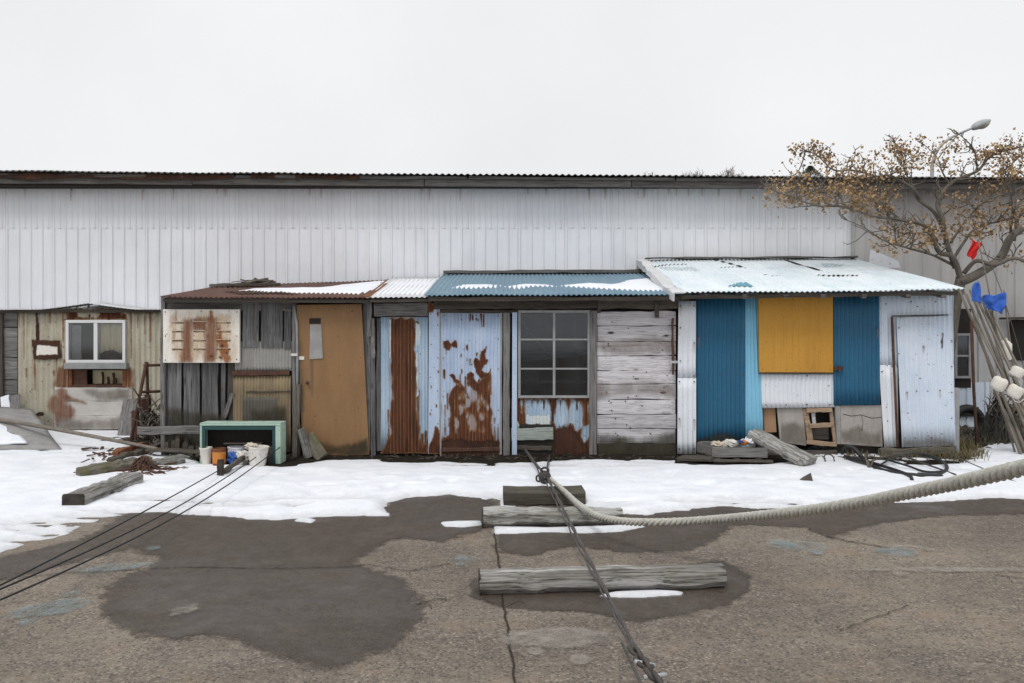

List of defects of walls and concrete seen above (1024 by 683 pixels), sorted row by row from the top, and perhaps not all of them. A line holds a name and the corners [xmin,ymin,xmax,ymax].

rust [23,308,151,418]
rust [173,311,230,363]
rust [380,316,500,456]
rust [511,398,589,455]
crack [492,526,523,683]